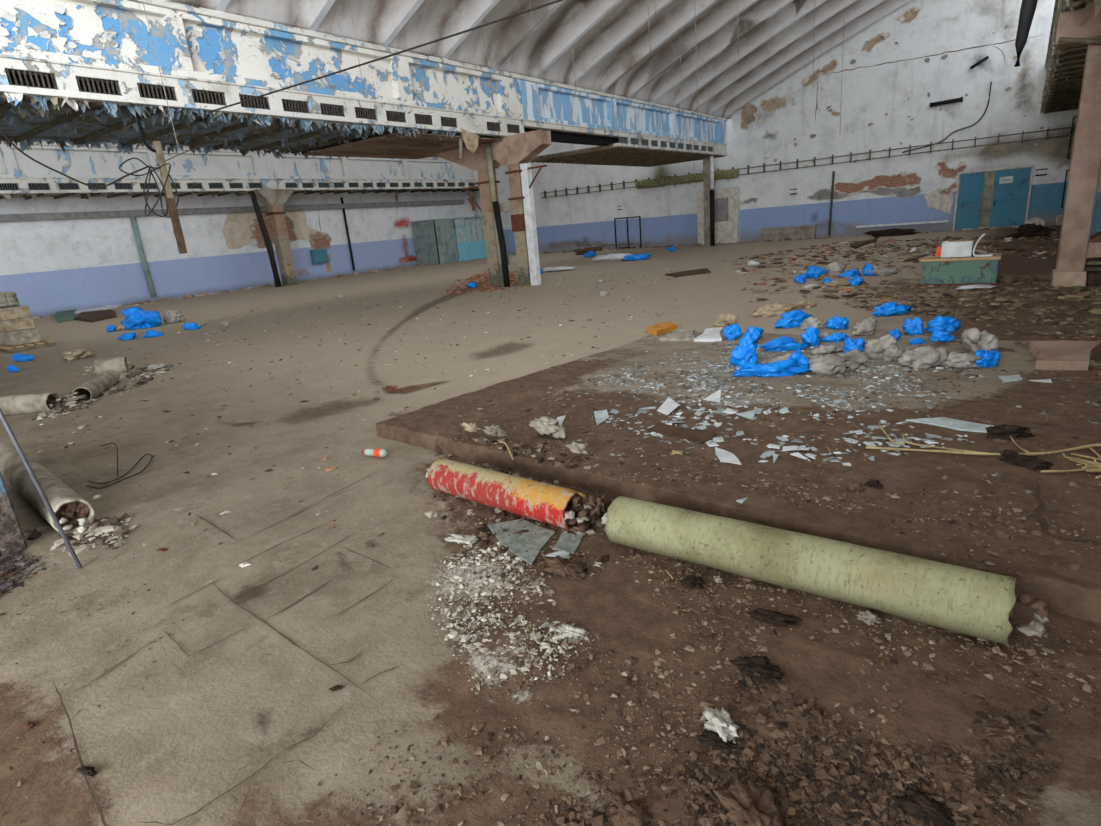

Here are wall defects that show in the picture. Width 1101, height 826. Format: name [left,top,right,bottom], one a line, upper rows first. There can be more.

peeling [0,3,77,54]
peeling [99,13,130,50]
peeling [193,26,226,75]
peeling [268,54,293,84]
peeling [324,70,367,93]
water stain [496,0,588,64]
water stain [723,18,769,51]
peeling [0,92,456,161]
spalling [807,149,967,214]
peeling [223,212,274,249]
crack [52,679,107,826]
crack [139,698,351,826]